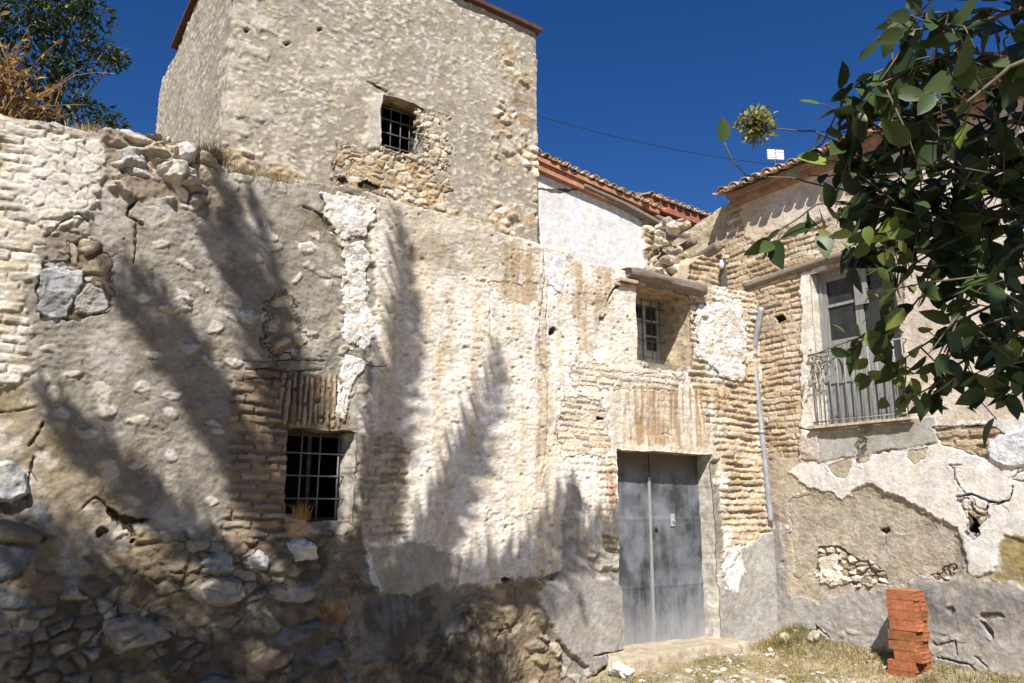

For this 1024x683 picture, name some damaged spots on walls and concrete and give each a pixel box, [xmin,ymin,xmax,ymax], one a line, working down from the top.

spalling [35,236,114,323]
crack [120,201,142,263]
spalling [318,104,455,420]
flaking render [692,297,748,382]
flaking render [902,447,928,464]
spalling [935,425,1000,460]
crack [80,485,114,511]
flaking render [785,454,994,588]
crack [949,465,1024,518]